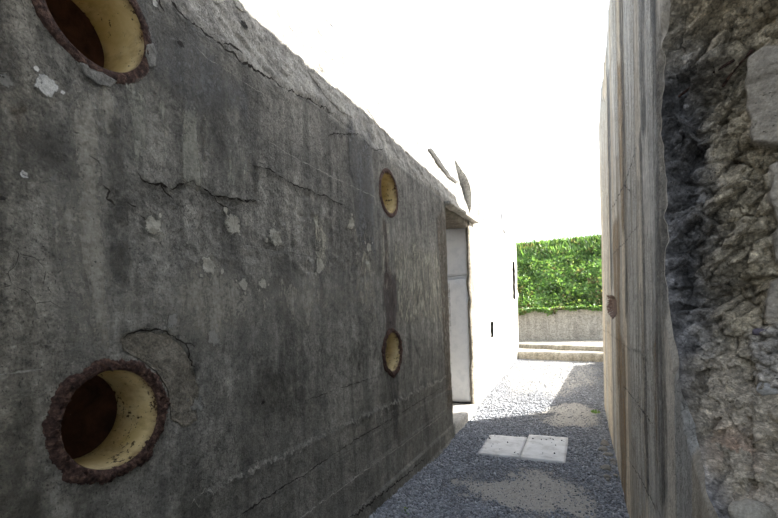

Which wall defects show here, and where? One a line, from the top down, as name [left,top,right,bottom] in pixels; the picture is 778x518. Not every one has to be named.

crack [158,0,382,151]
leakage [183,107,212,189]
leakage [50,88,131,347]
crack [137,171,265,209]
crack [250,163,344,205]
leakage [176,267,248,336]
crack [124,328,195,367]